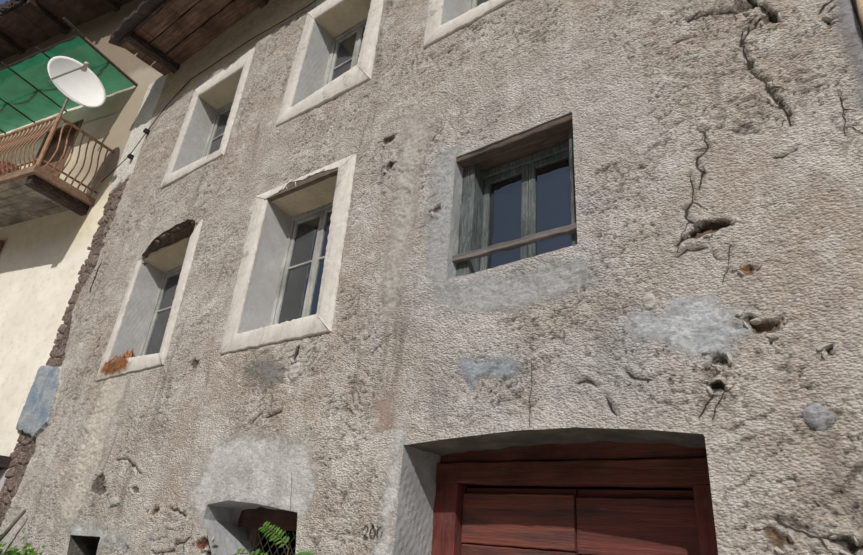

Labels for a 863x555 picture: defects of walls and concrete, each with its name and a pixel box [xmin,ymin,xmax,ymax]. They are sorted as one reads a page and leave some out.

crack [673,0,792,128]
crack [676,129,731,284]
flaking render [683,217,736,240]
crack [774,517,863,555]